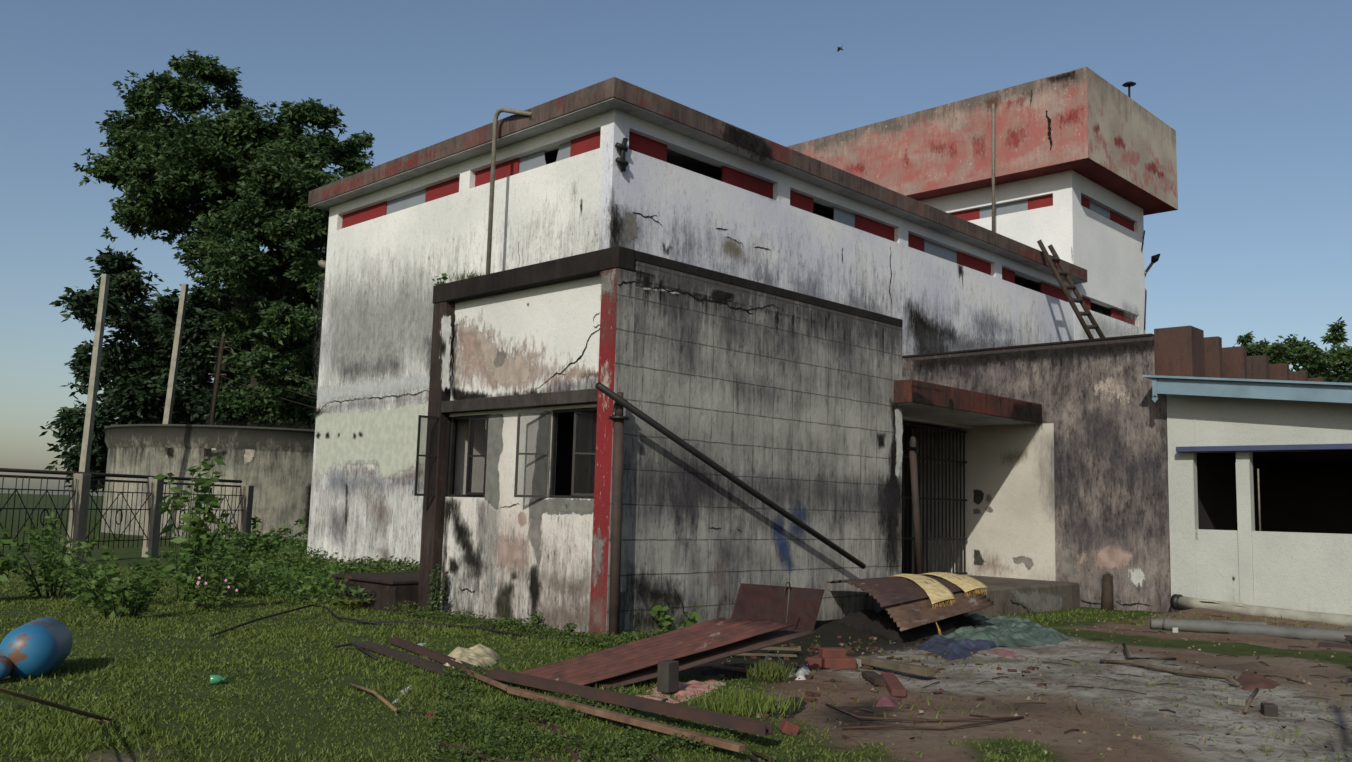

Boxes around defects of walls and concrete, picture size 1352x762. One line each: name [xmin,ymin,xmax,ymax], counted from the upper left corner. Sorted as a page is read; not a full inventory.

crack [1030,90,1052,150]
water stain [609,201,630,247]
crack [320,314,455,411]
water stain [332,282,446,372]
peeling [439,315,609,409]
crack [535,281,779,389]
water stain [877,402,905,569]
peeling [973,490,993,514]
water stain [441,498,495,606]
water stain [529,566,583,627]
peeling [974,550,984,565]
peeling [1013,556,1033,570]